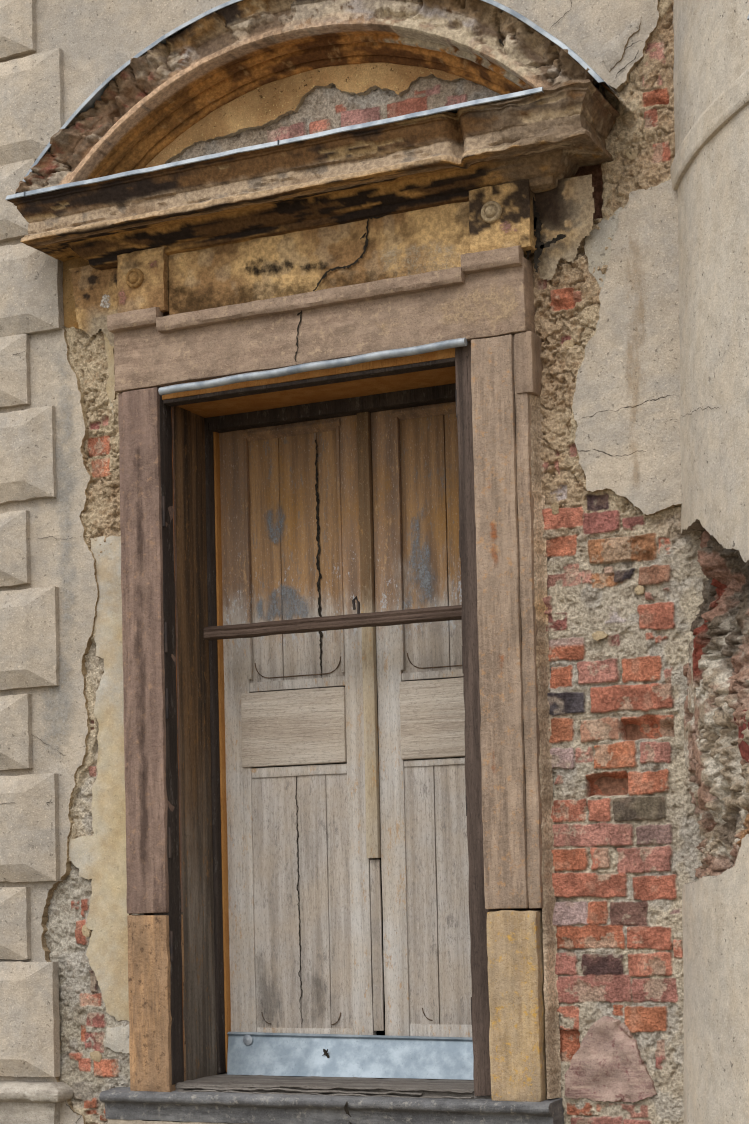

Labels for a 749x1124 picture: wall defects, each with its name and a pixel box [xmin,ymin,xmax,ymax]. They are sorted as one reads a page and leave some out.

flaking render [65,327,121,565]
crack [295,214,389,361]
flaking render [524,0,749,1124]
crack [590,395,720,417]
flaking render [69,630,104,839]
flaking render [45,857,130,1124]